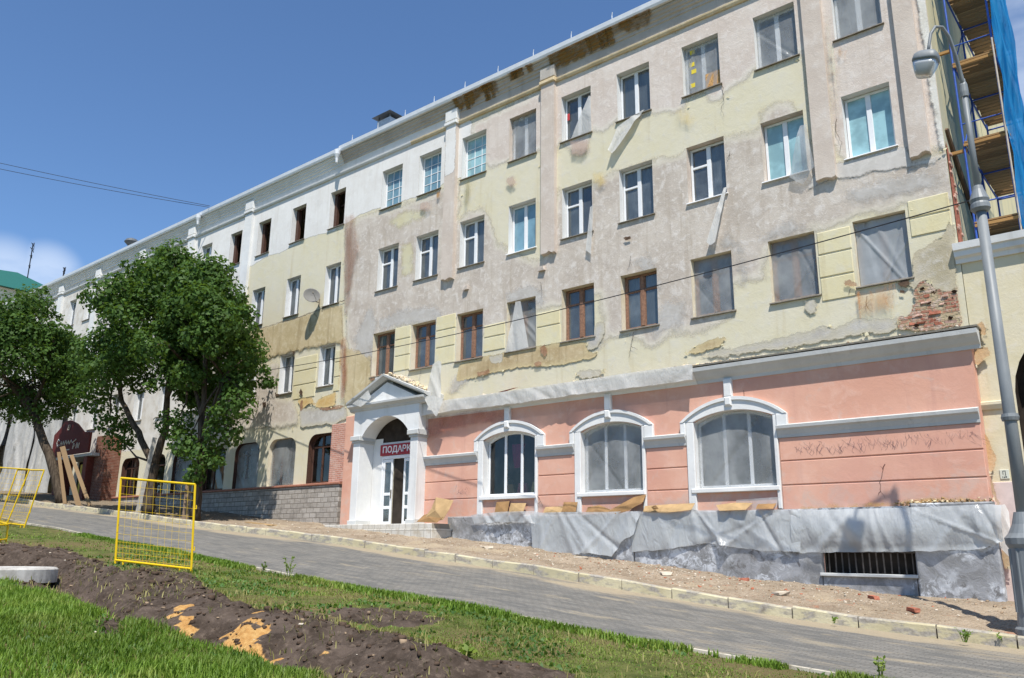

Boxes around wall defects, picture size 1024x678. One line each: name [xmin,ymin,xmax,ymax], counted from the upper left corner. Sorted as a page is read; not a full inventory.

peeling [224,0,964,432]